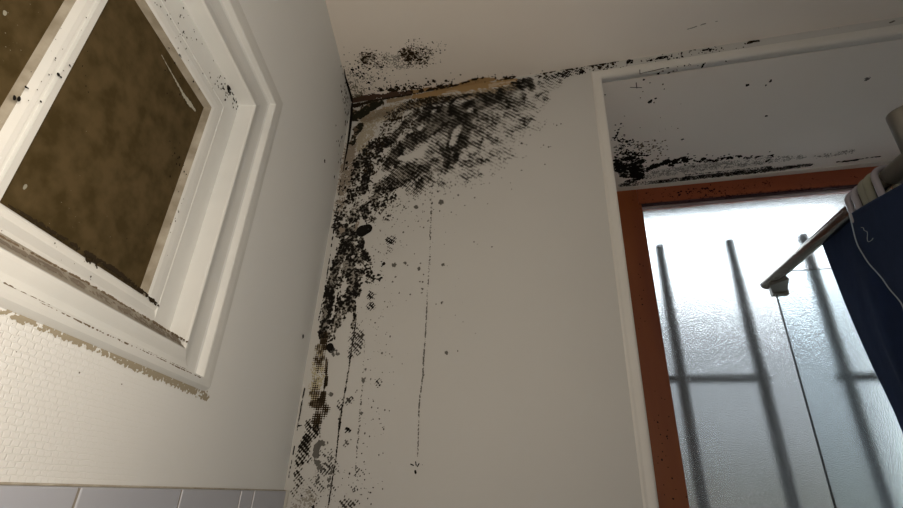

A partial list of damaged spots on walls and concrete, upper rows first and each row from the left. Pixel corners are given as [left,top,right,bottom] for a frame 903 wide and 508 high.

peeling [488,80,531,89]
damp [612,116,855,209]
damp [290,38,724,508]